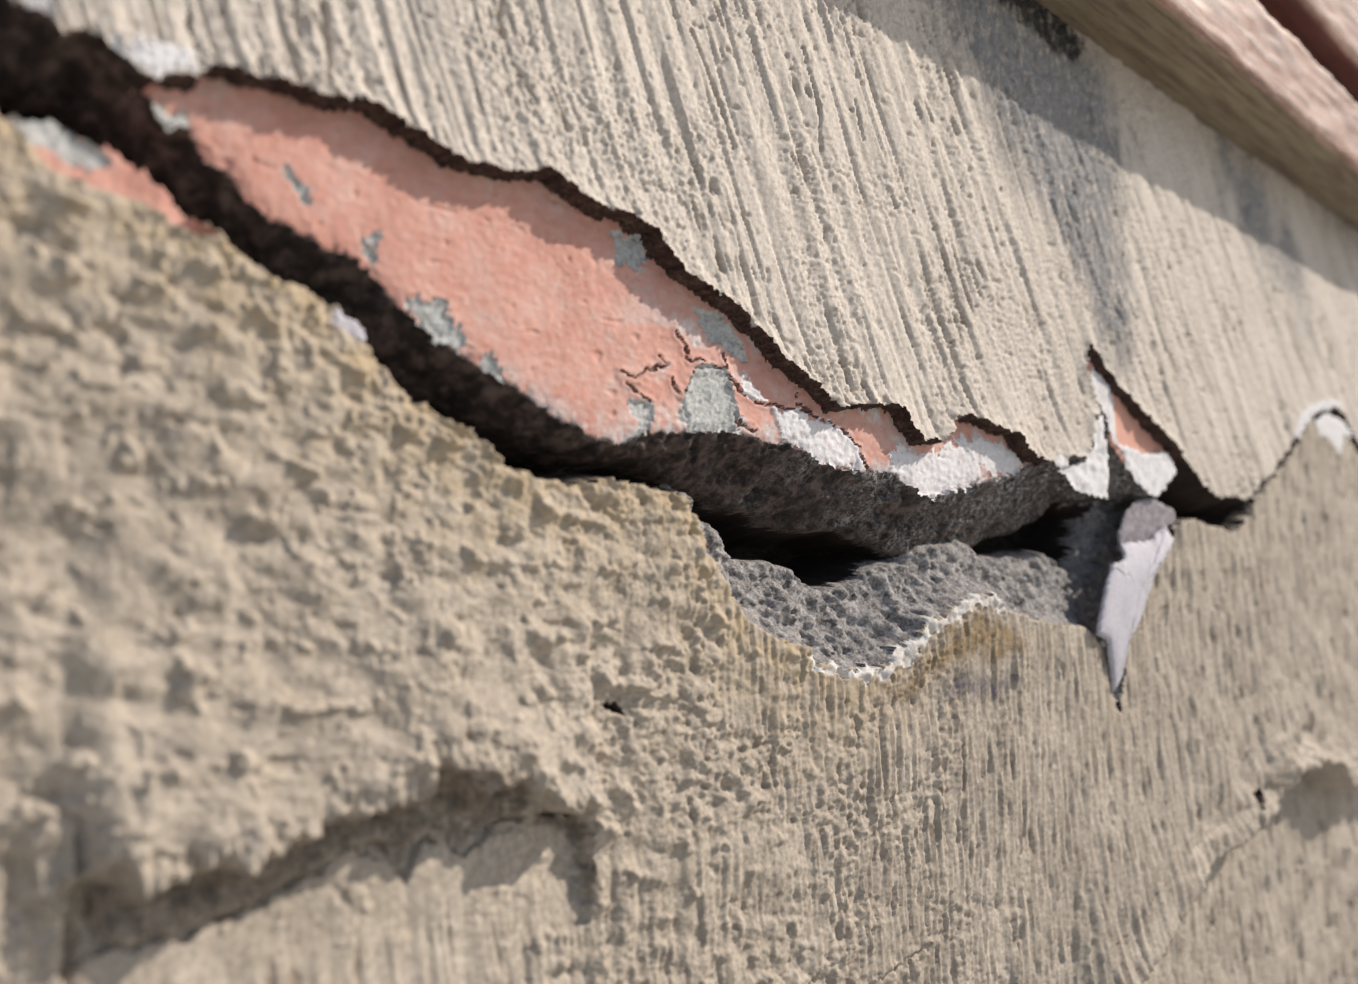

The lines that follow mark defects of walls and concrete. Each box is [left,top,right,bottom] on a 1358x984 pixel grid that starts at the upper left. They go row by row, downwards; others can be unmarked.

peeling [0,115,221,237]
peeling [109,29,1188,712]
crack [0,0,1358,587]
water stain [954,0,1132,366]
spalling [1293,398,1352,457]